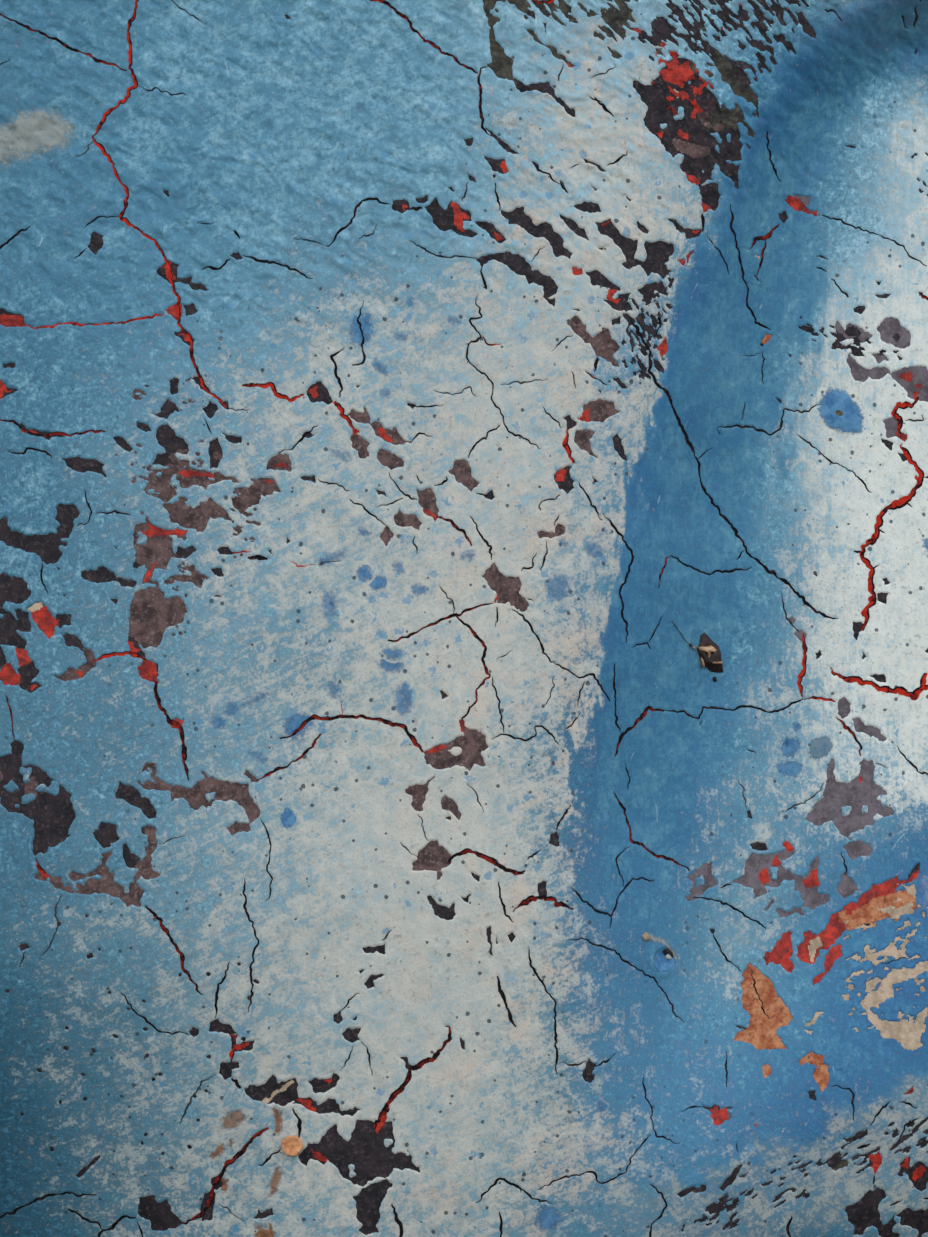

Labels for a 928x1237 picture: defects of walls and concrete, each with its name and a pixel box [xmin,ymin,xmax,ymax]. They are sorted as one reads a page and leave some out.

crack [0,0,327,411]
crack [352,301,366,366]
crack [434,297,576,458]
peeling [327,0,816,510]
peeling [799,255,928,402]
peeling [0,349,565,995]
crack [486,317,928,1083]
peeling [685,758,928,1086]
peeling [108,969,465,1237]
crack [476,1077,680,1204]
crack [782,1216,793,1237]
peeling [649,1052,928,1237]